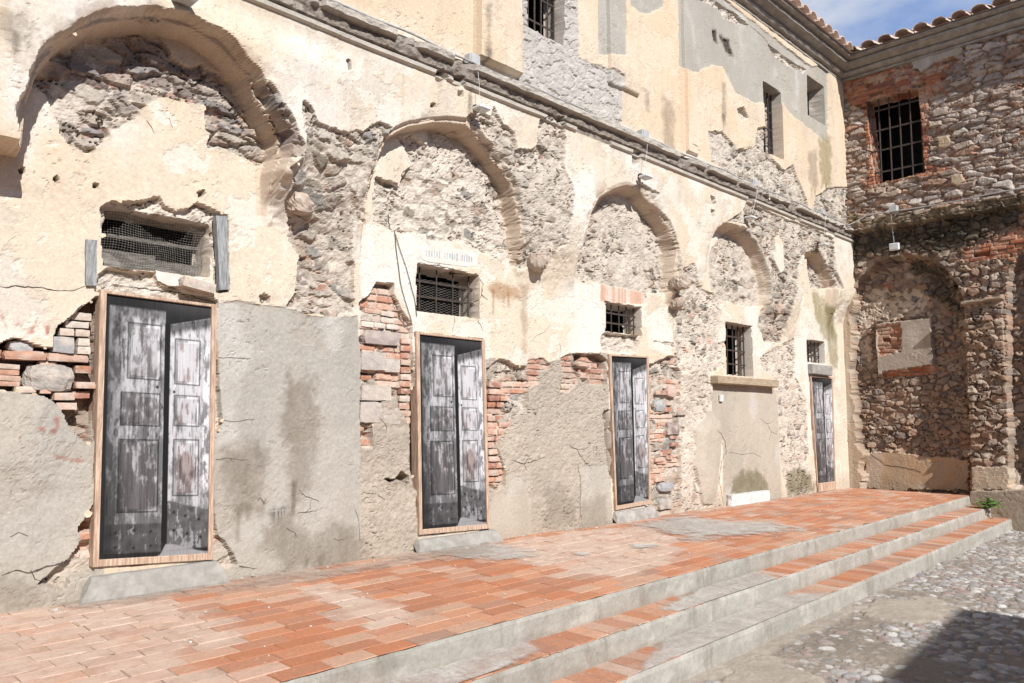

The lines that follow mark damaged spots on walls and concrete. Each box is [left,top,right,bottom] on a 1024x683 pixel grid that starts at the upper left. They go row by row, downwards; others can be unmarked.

crack [1,557,70,581]
flaking render [0,13,575,449]
flaking render [486,332,643,492]
flaking render [575,130,851,514]